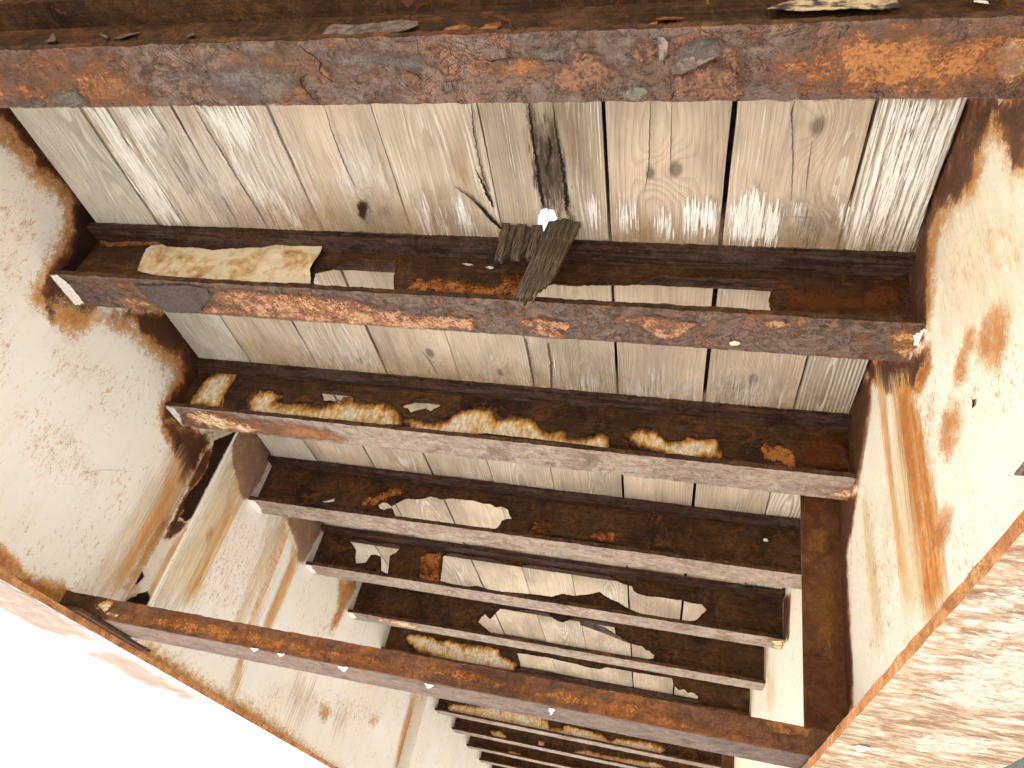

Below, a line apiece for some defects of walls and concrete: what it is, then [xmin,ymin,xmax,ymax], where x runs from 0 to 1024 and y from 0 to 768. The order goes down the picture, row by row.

corrosion [629,36,745,101]
crack [454,104,502,229]
crack [524,103,575,220]
peeling [137,244,322,284]
corrosion [202,288,477,331]
corrosion [0,49,407,670]
peeling [188,373,237,407]
peeling [245,390,723,459]
corrosion [758,19,1024,714]
corrosion [0,544,322,758]
peeling [377,617,519,671]
peeling [445,703,669,768]